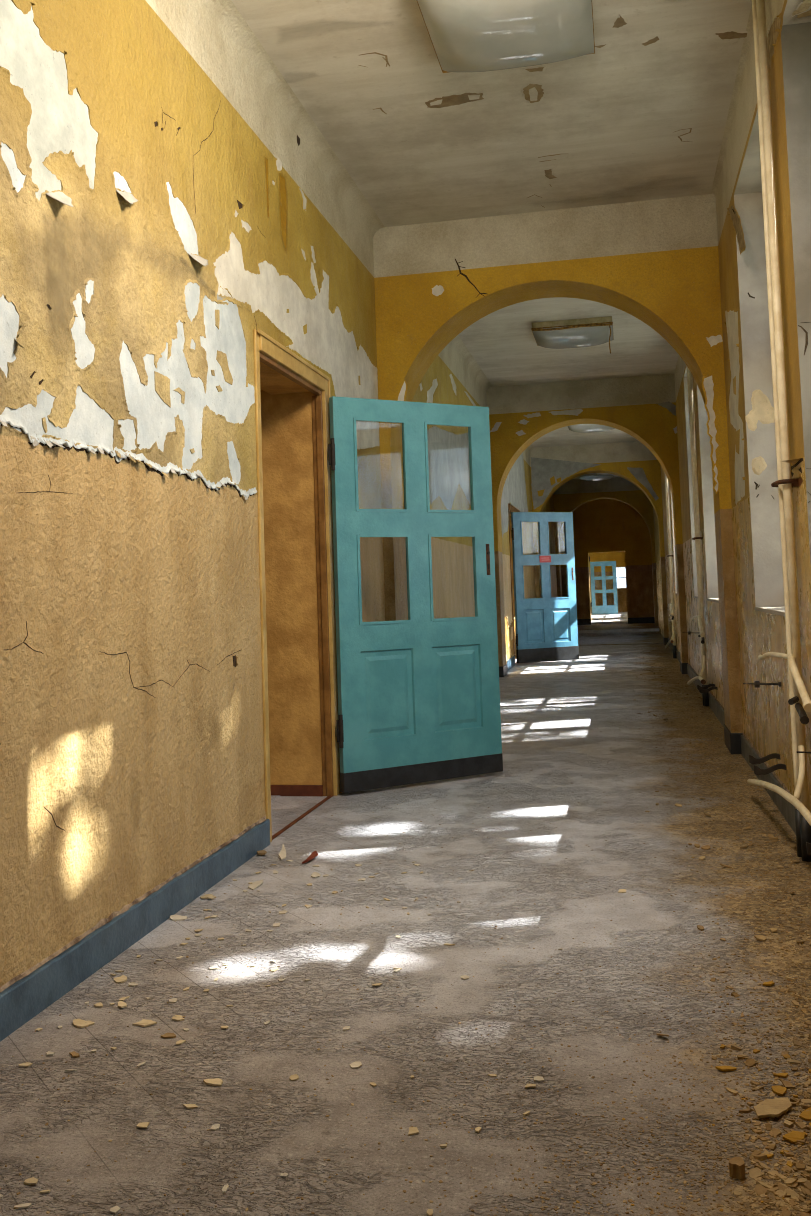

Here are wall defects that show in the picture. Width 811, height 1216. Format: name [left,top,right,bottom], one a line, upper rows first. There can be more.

peeling [767,0,811,74]
peeling [0,0,138,207]
peeling [423,91,486,109]
peeling [520,65,547,104]
crack [161,100,221,212]
crack [455,259,487,297]
peeling [0,178,380,500]
peeling [702,308,775,507]
peeling [427,425,471,510]
peeling [501,453,602,538]
crack [4,621,43,654]
crack [100,650,240,697]